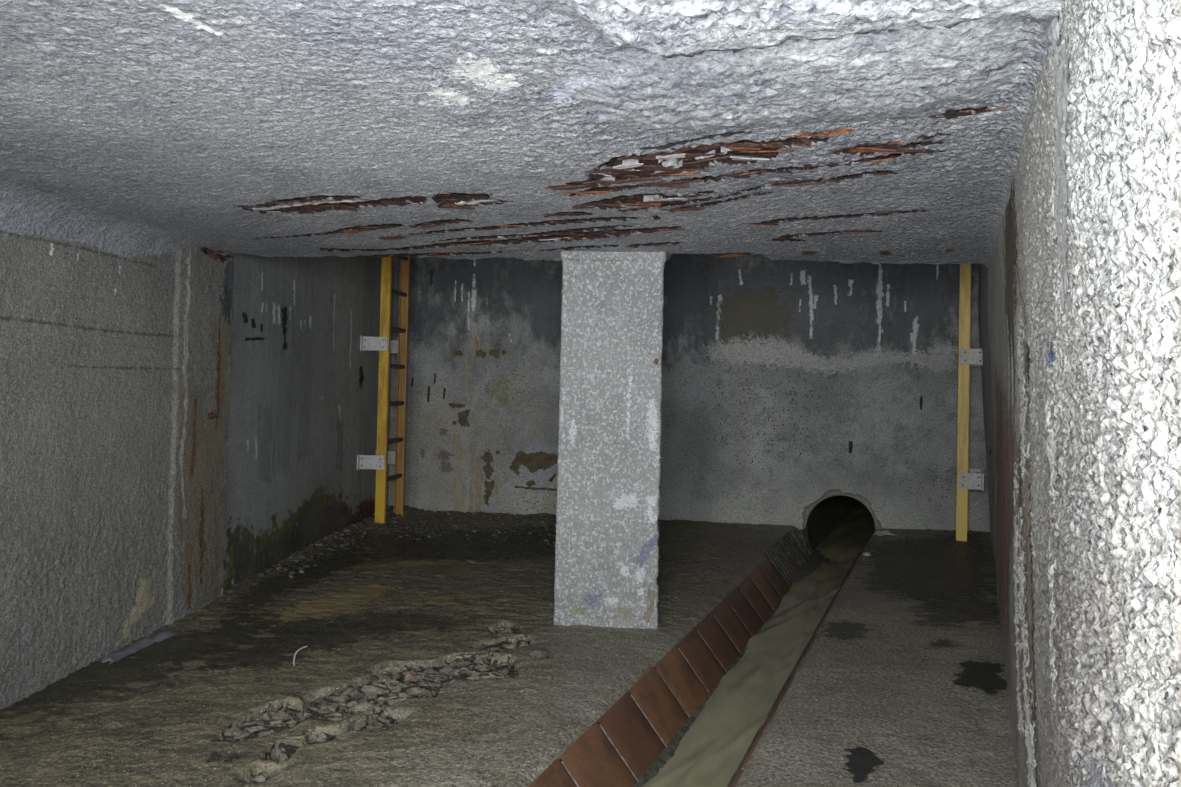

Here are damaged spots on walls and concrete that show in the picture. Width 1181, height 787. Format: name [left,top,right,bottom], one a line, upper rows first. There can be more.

spalling [234,107,1008,258]
leakage [662,254,975,381]
peeling [480,449,500,505]
peeling [509,450,558,491]